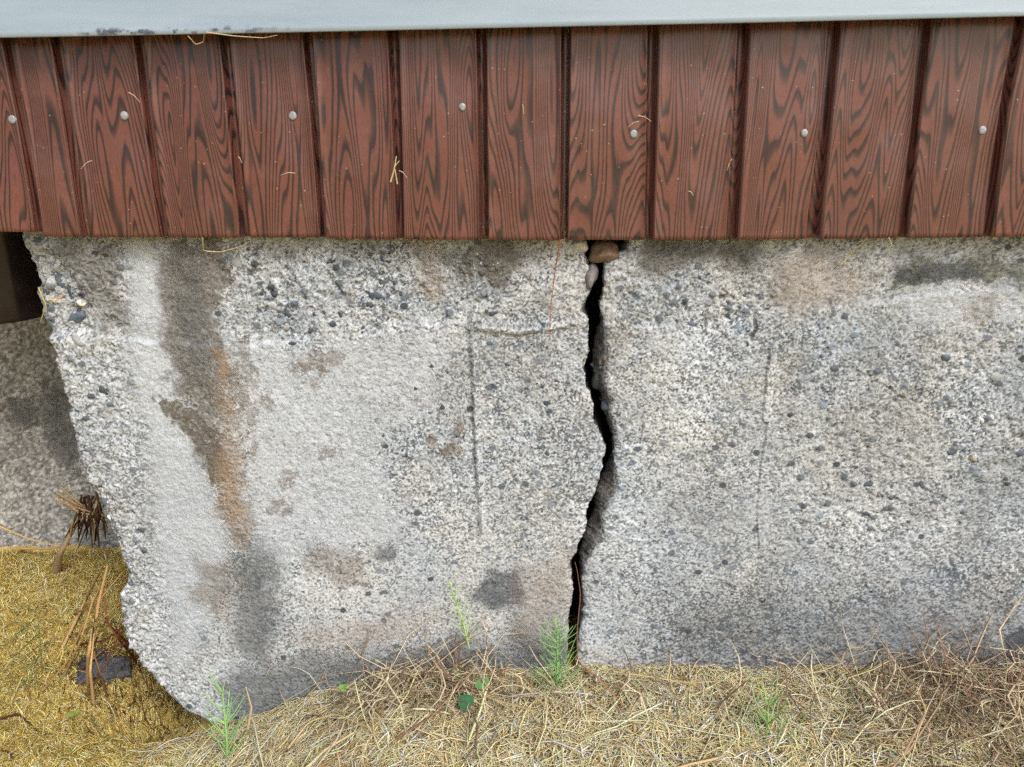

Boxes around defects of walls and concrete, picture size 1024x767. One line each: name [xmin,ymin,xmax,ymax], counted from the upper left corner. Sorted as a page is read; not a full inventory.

water stain [127,237,235,665]
water stain [477,574,523,607]
crack [566,240,629,664]